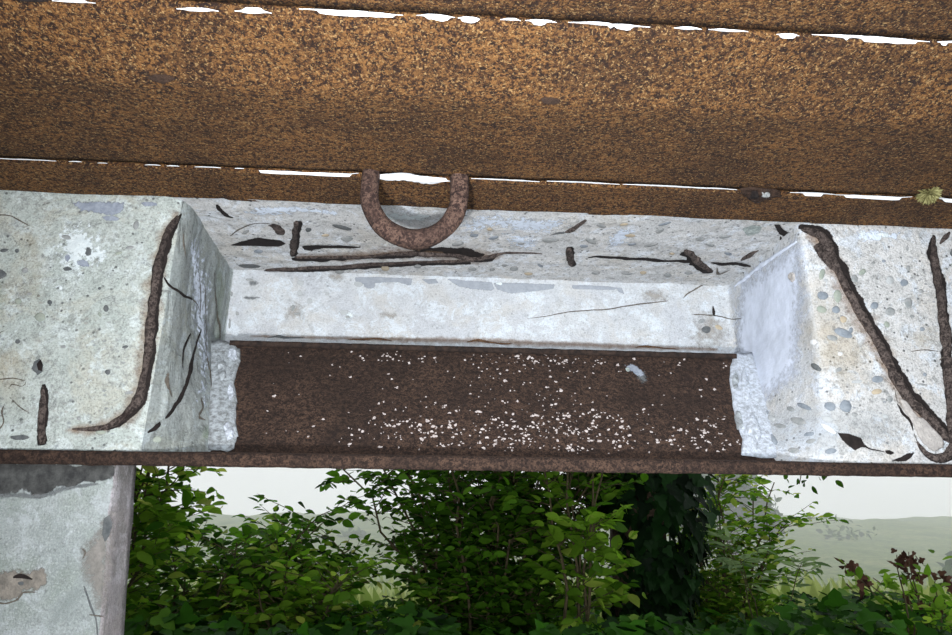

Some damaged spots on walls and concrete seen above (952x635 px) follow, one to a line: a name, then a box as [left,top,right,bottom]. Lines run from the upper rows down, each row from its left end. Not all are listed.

rust [541,97,560,105]
rust [739,187,782,203]
peeling [46,201,134,280]
spalling [230,206,671,315]
spalling [670,235,731,275]
spalling [72,214,221,434]
spalling [697,306,723,339]
rust [345,338,695,349]
spalling [766,224,952,463]
damp [0,464,114,498]
spalling [0,568,47,604]